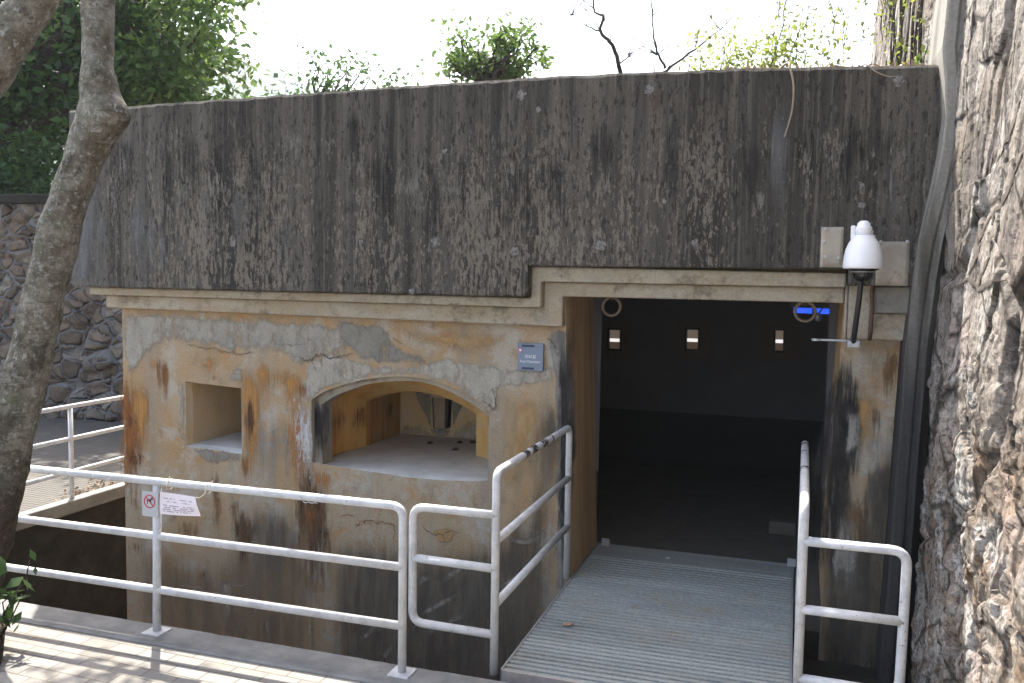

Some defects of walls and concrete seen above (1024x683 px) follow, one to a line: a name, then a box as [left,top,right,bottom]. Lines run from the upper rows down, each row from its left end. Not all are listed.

damp [72,197,103,279]
rust [120,382,147,505]
rust [150,362,168,396]
rust [242,365,330,590]
crack [272,343,352,370]
flaking render [123,314,565,588]
crack [342,514,396,537]
damp [539,328,576,544]
damp [809,366,891,668]